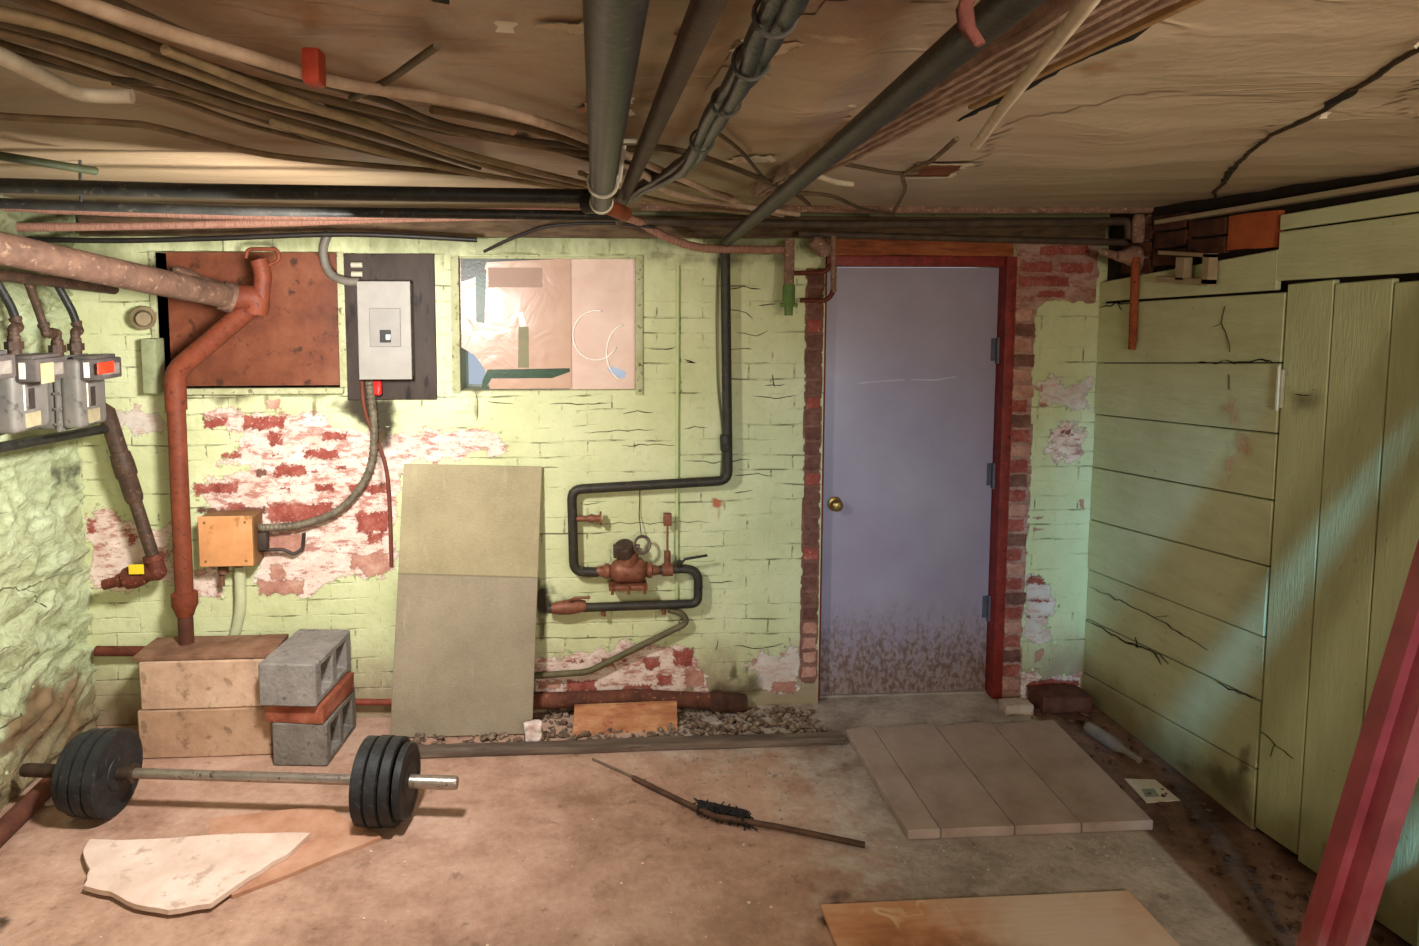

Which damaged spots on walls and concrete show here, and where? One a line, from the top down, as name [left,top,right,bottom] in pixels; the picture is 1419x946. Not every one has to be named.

crack [1211,42,1419,200]
peeling [85,503,174,596]
peeling [116,404,167,437]
peeling [193,399,509,602]
flaking render [1002,243,1099,698]
peeling [534,637,709,693]
crack [1086,587,1255,698]
crack [1261,732,1293,759]